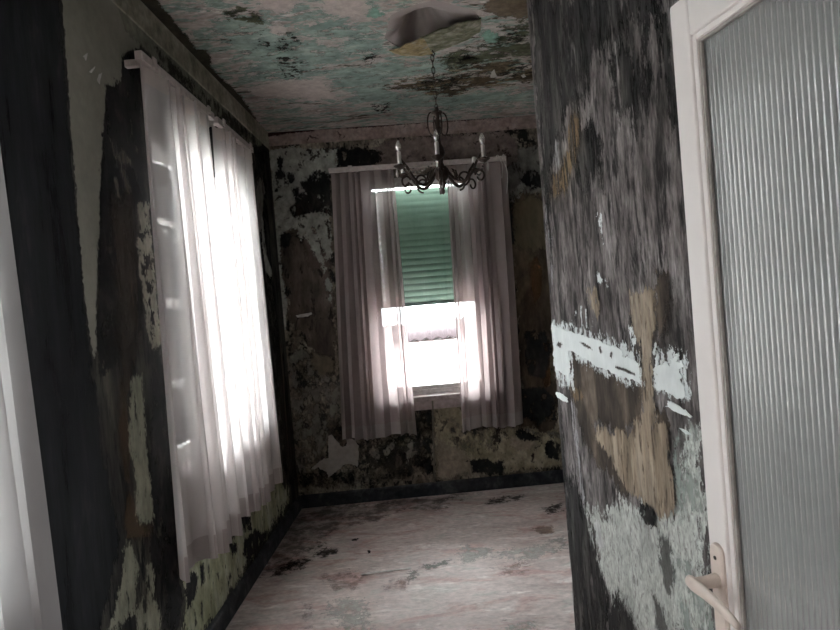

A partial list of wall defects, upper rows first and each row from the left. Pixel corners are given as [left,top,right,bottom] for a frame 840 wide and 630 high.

flaking render [319,0,377,17]
peeling [62,0,348,360]
leakage [382,0,716,630]
peeling [551,306,692,418]
peeling [126,372,156,526]
peeling [108,539,162,630]